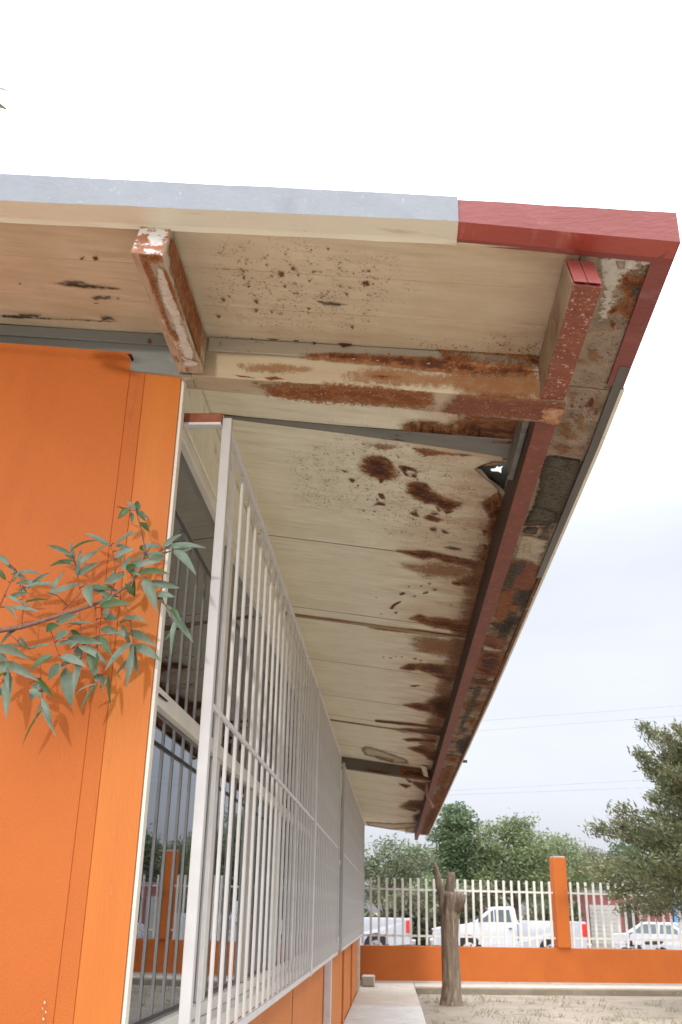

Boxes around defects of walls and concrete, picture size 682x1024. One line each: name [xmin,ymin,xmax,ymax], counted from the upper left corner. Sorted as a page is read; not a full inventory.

peeling [156,267,200,381]
rust [222,247,390,323]
rust [236,273,644,835]